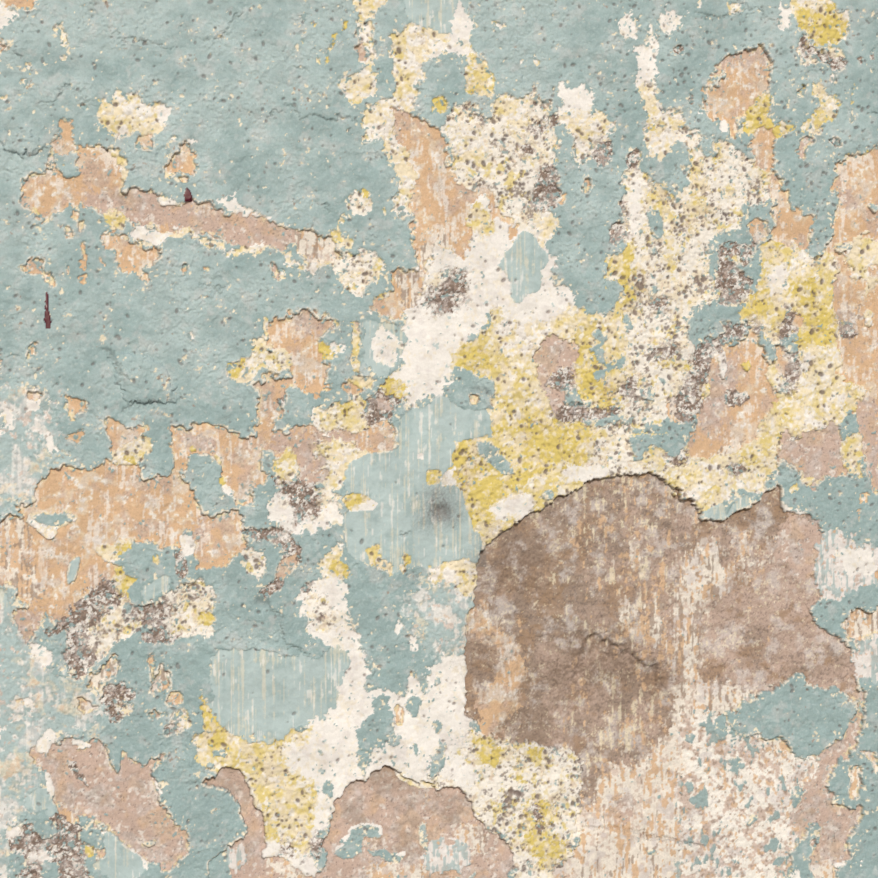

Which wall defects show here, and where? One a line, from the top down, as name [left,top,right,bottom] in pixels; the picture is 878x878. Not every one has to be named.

peeling [618,10,638,40]
peeling [656,5,688,34]
peeling [727,0,745,15]
peeling [778,0,851,86]
peeling [0,0,617,878]
flaking render [191,19,878,878]